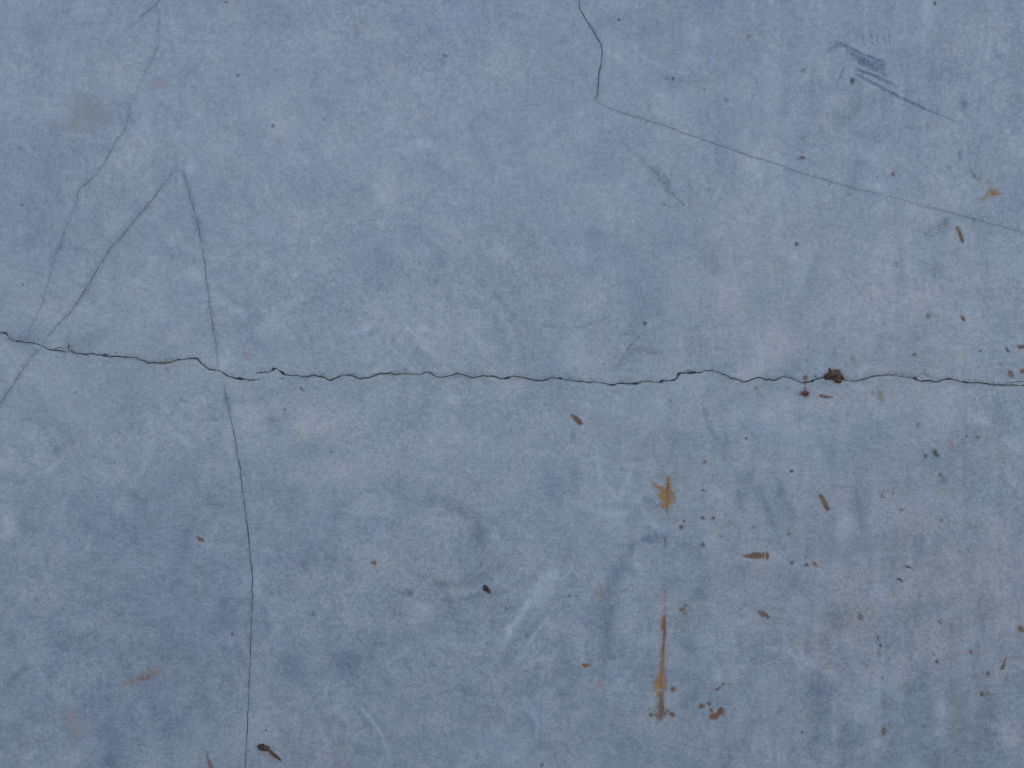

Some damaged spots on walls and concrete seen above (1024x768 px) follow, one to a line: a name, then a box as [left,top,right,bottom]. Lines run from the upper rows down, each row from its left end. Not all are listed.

crack [35,115,130,319]
crack [579,2,1024,233]
crack [0,168,1024,766]
corrosion [652,475,676,515]
corrosion [649,590,687,723]
corrosion [733,551,769,560]